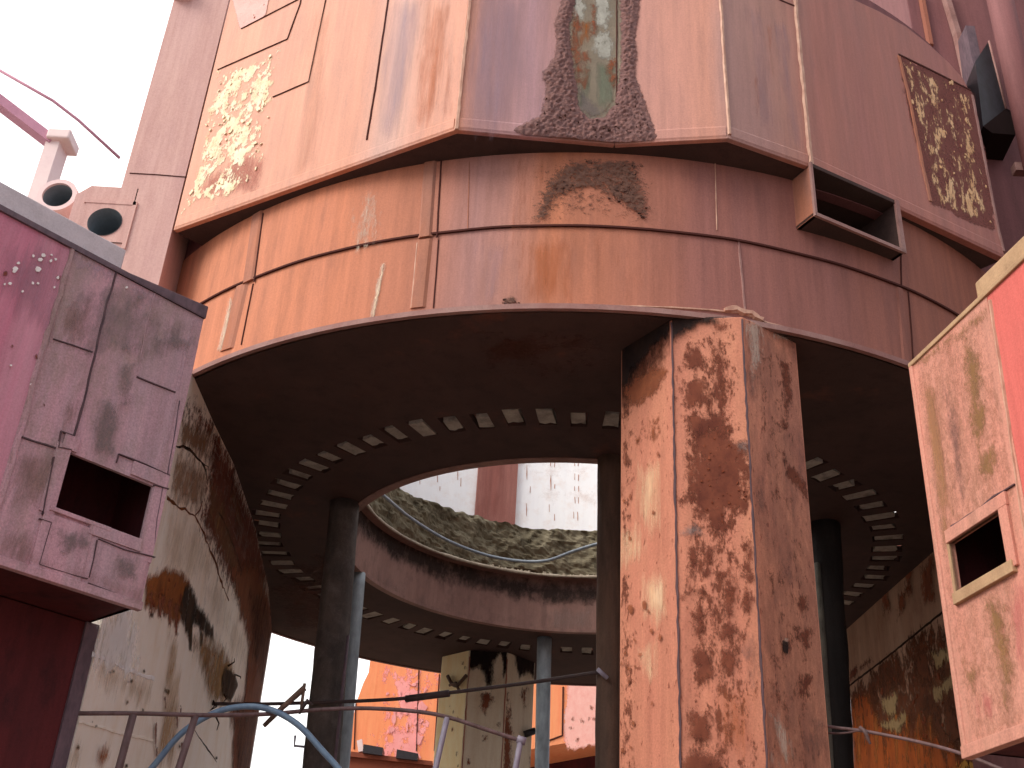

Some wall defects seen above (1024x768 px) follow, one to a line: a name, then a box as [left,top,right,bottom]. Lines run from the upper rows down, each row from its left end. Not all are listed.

peeling [181,47,282,214]
peeling [905,62,992,223]
corrosion [145,567,190,759]
crack [167,445,242,601]
corrosion [172,398,272,768]
peeling [373,665,439,759]
corrosion [621,323,815,768]
corrosion [849,620,973,768]